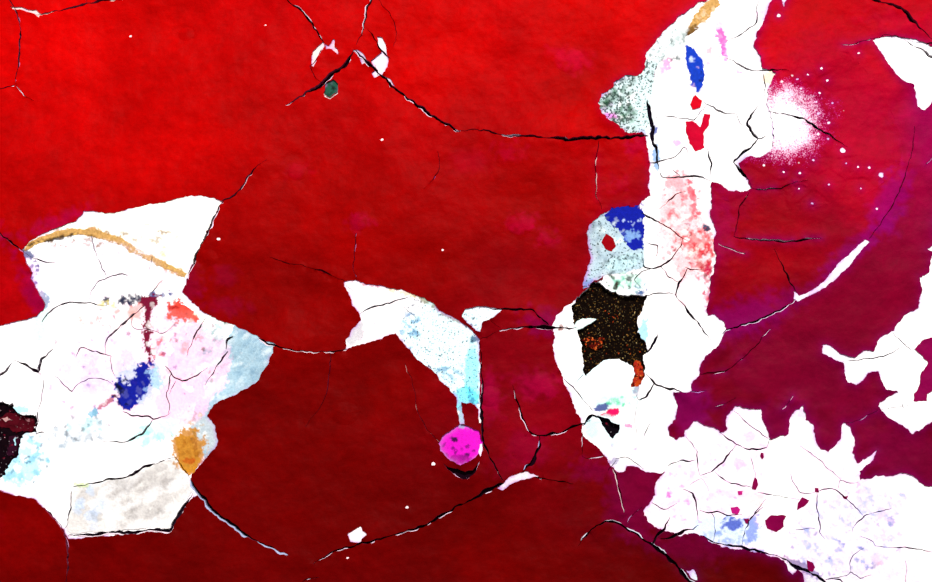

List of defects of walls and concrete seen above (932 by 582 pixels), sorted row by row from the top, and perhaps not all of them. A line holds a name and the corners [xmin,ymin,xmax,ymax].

crack [286,0,460,132]
crack [872,0,932,58]
peeling [0,195,276,539]
crack [270,233,357,291]
peeling [344,280,501,465]
crack [304,64,932,582]
peeling [552,0,932,582]